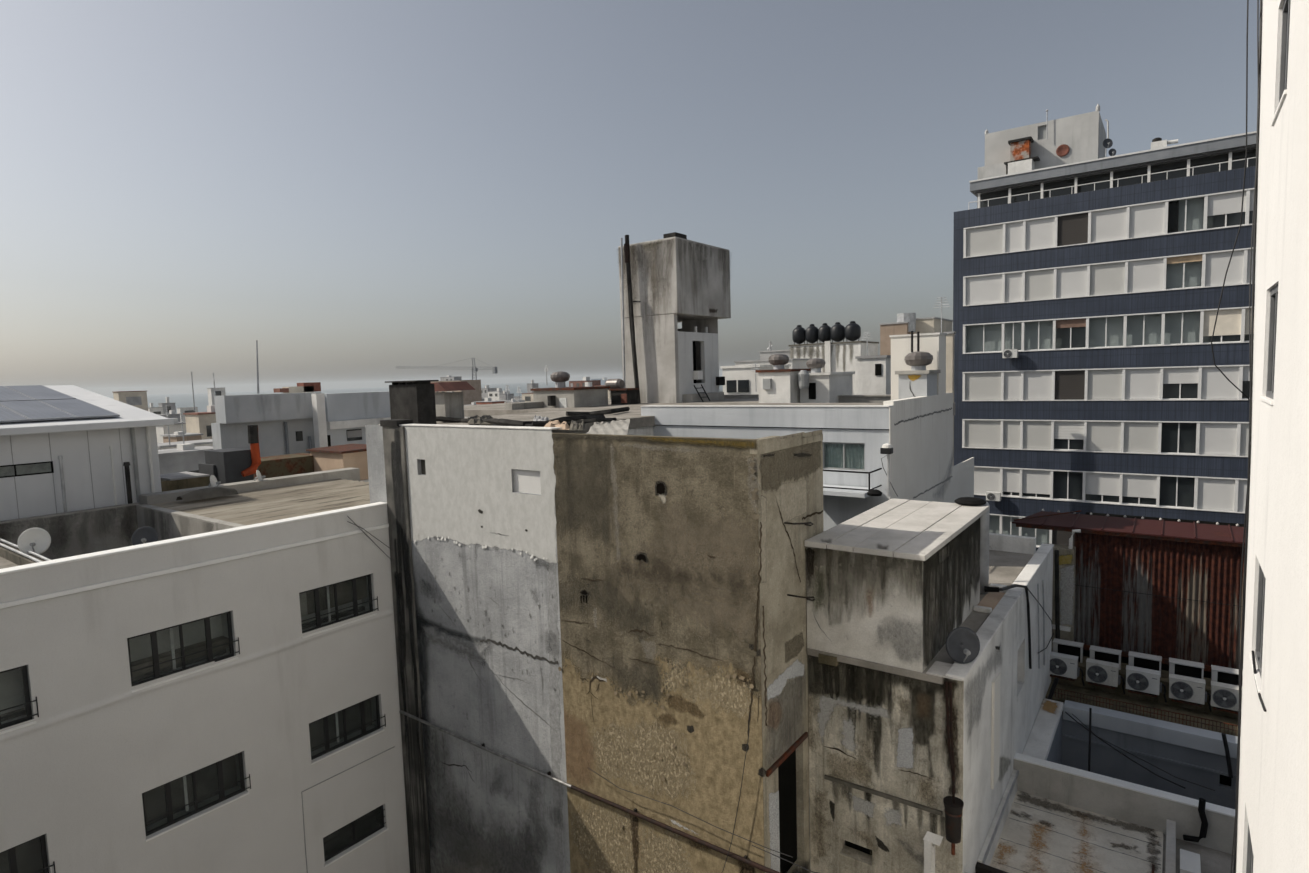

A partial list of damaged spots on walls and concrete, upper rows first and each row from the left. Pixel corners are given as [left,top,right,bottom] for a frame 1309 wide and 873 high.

damp [391,429,532,873]
crack [471,496,823,734]
damp [552,444,766,705]
peeling [558,655,767,873]
damp [833,782,944,834]
damp [805,517,981,777]